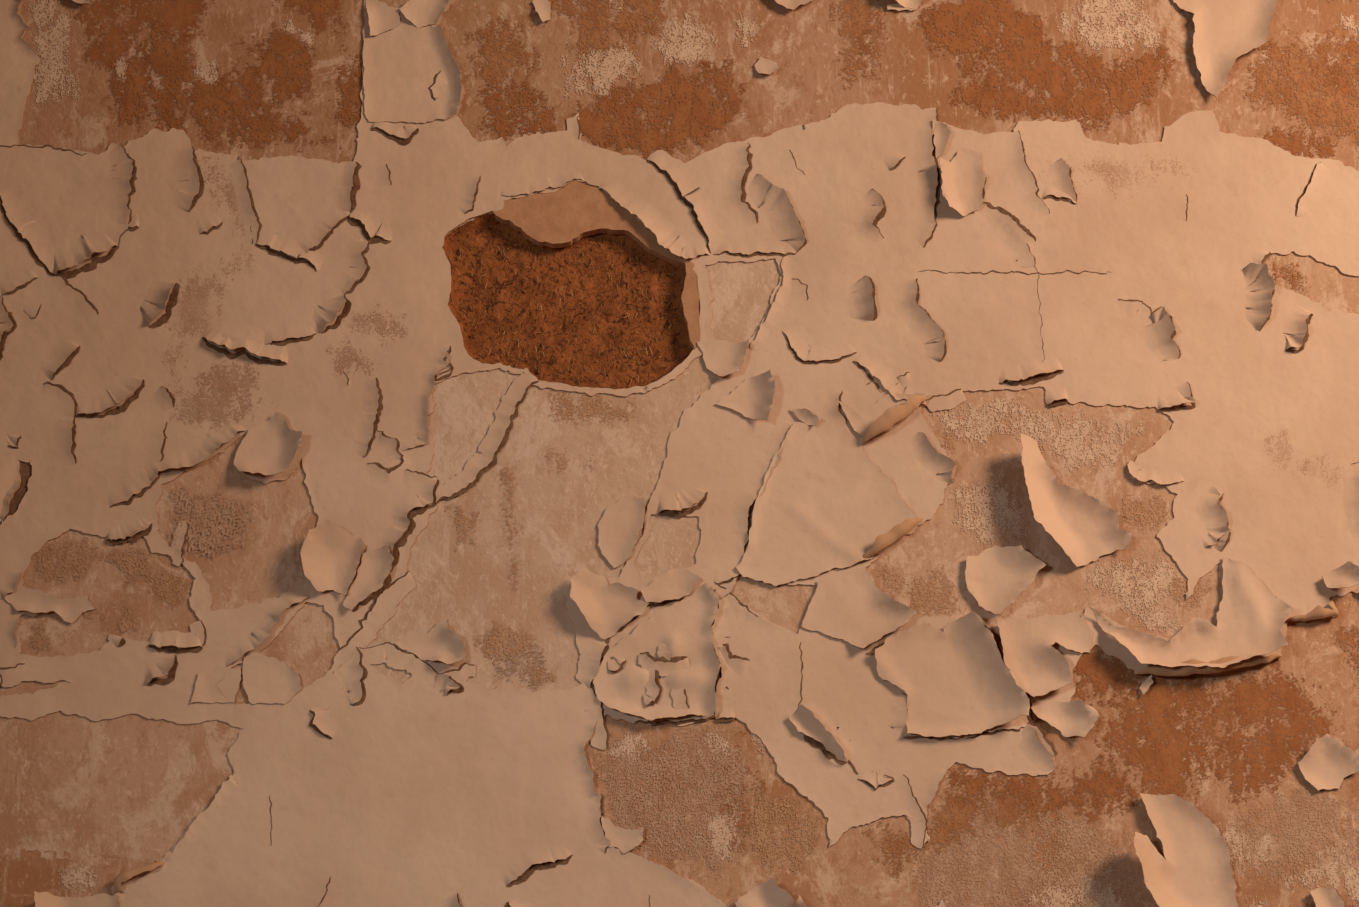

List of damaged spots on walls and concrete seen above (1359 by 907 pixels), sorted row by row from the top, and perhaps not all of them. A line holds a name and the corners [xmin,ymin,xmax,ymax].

crack [0,132,180,545]
peeling [0,711,242,907]
crack [108,620,207,686]
crack [173,122,419,366]
crack [309,372,539,739]
peeling [0,0,1359,710]
peeling [361,169,1359,907]
crack [576,108,1196,750]
crack [848,692,1057,849]
crack [1195,487,1231,577]
crack [1243,247,1313,353]
crack [1296,162,1330,217]